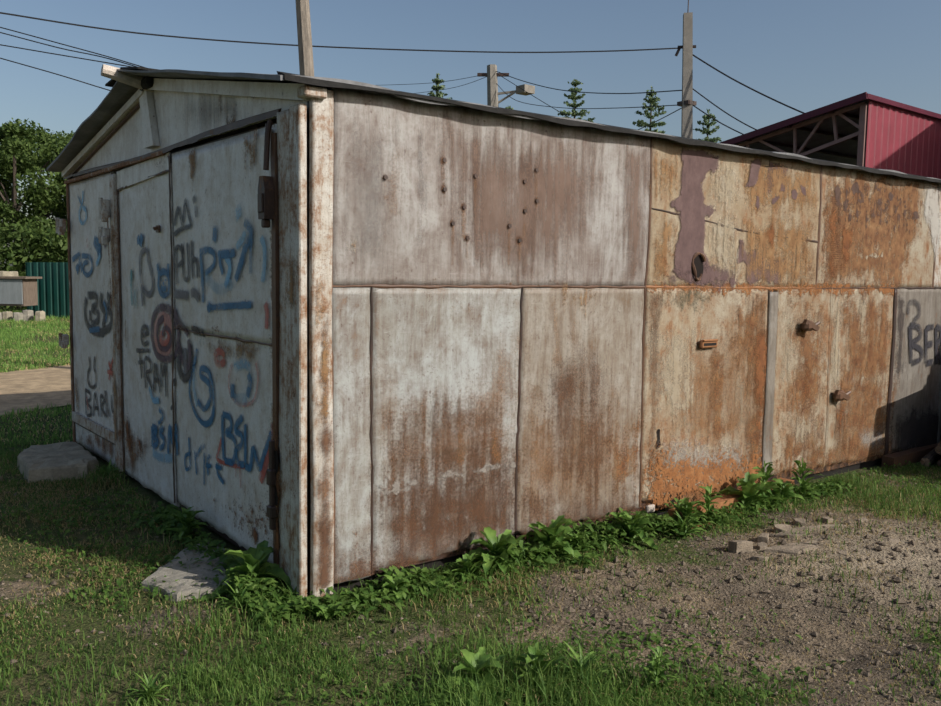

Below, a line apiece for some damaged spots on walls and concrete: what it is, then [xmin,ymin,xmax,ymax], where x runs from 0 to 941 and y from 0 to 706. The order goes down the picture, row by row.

corrosion [441,132,602,272]
corrosion [320,334,332,457]
corrosion [530,151,923,526]
corrosion [317,469,376,589]
corrosion [381,403,516,570]